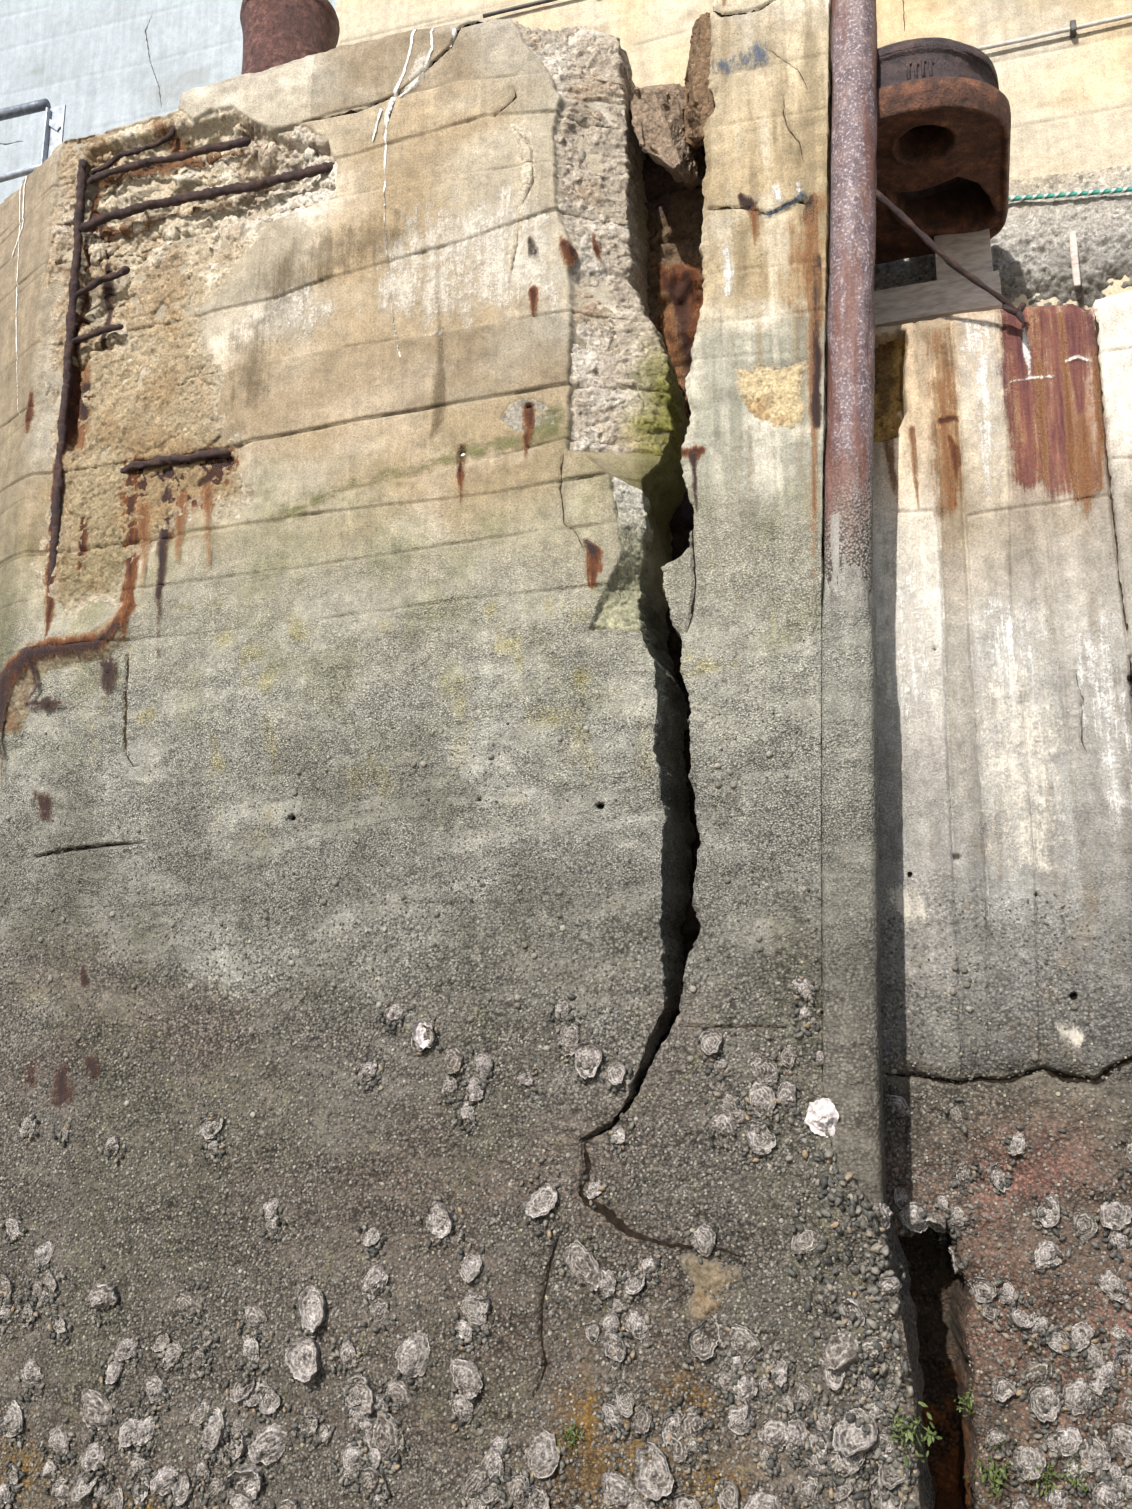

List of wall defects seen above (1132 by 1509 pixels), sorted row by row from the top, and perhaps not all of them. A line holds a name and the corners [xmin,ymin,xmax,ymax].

corrosion [0,446,239,777]
spalling [30,109,338,646]
water stain [264,246,332,327]
water stain [372,28,556,357]
corrosion [559,234,604,267]
spalling [501,21,683,474]
spalling [592,477,654,637]
crack [642,151,805,352]
corrosion [998,304,1107,513]
crack [1094,314,1132,699]
crack [633,489,786,1099]
crack [886,1057,1132,1085]